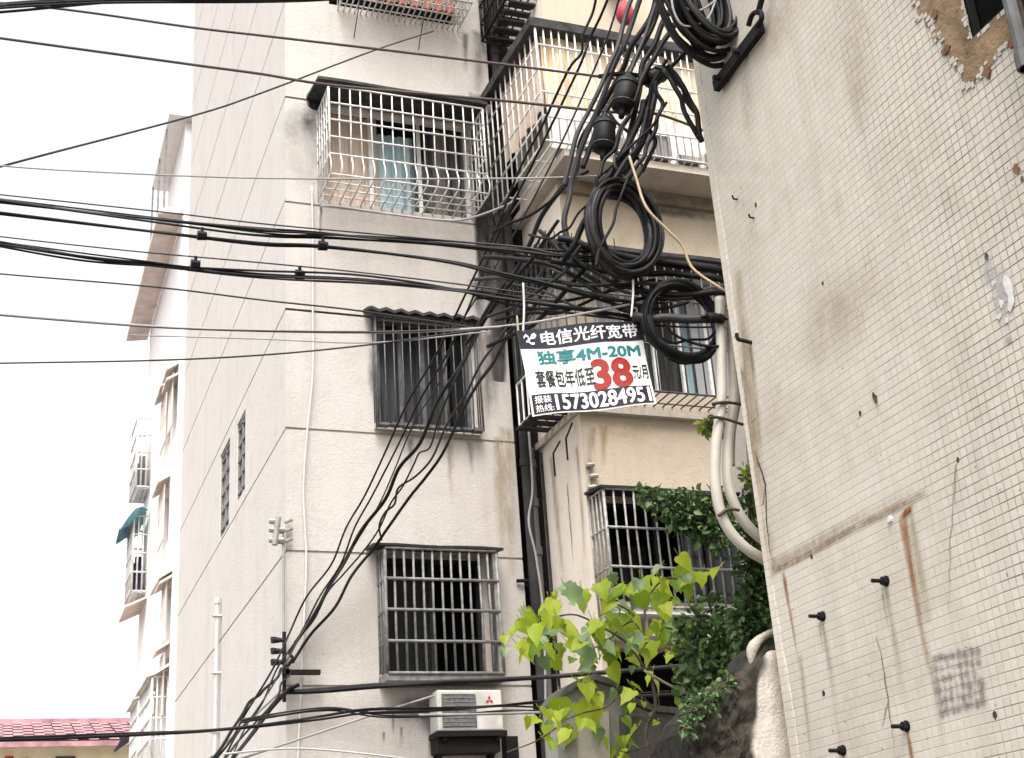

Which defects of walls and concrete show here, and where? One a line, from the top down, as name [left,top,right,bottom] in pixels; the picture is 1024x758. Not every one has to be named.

spalling [910,0,1014,91]
corrosion [776,494,920,632]